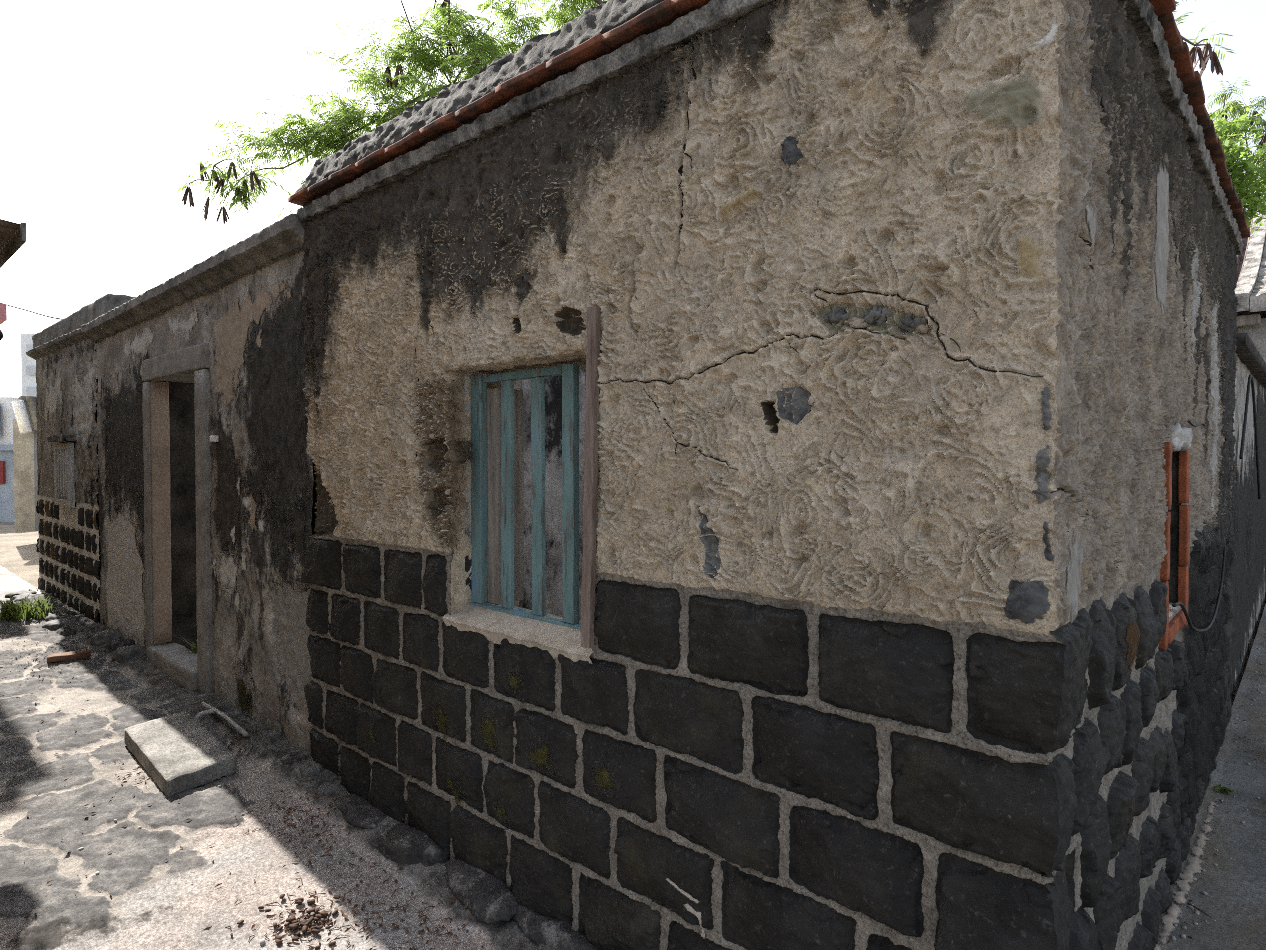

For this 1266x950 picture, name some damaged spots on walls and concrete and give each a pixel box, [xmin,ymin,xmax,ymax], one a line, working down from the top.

water stain [88,379,144,540]
spalling [311,465,338,537]
water stain [209,49,673,580]
spalling [776,386,814,425]
crack [601,289,1043,470]
spalling [812,304,932,335]
water stain [1088,0,1266,814]